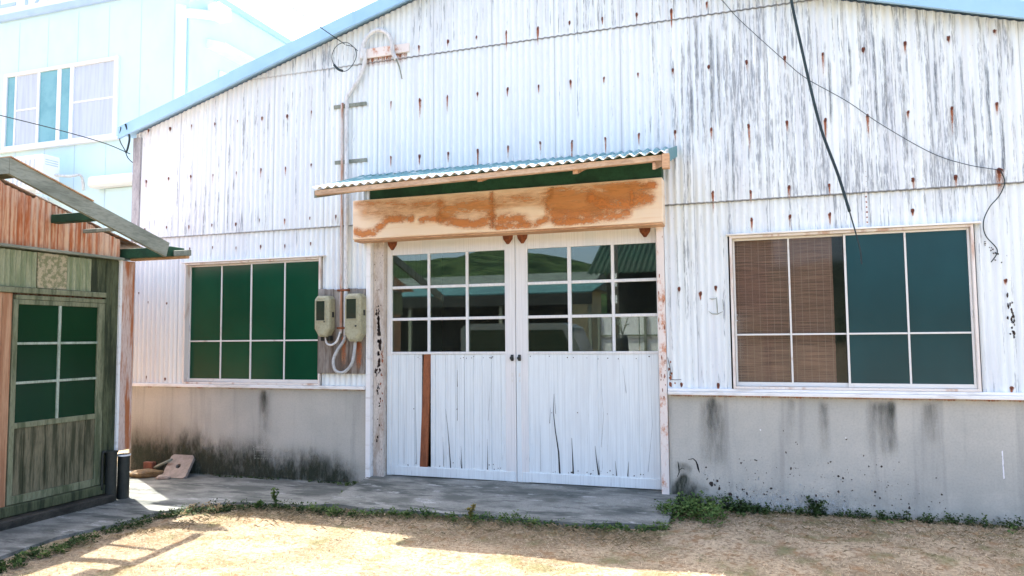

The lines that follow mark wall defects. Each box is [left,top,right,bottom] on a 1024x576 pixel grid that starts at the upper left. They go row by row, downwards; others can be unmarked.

damp [952,61,978,165]
damp [986,71,1005,169]
peeling [374,305,383,450]